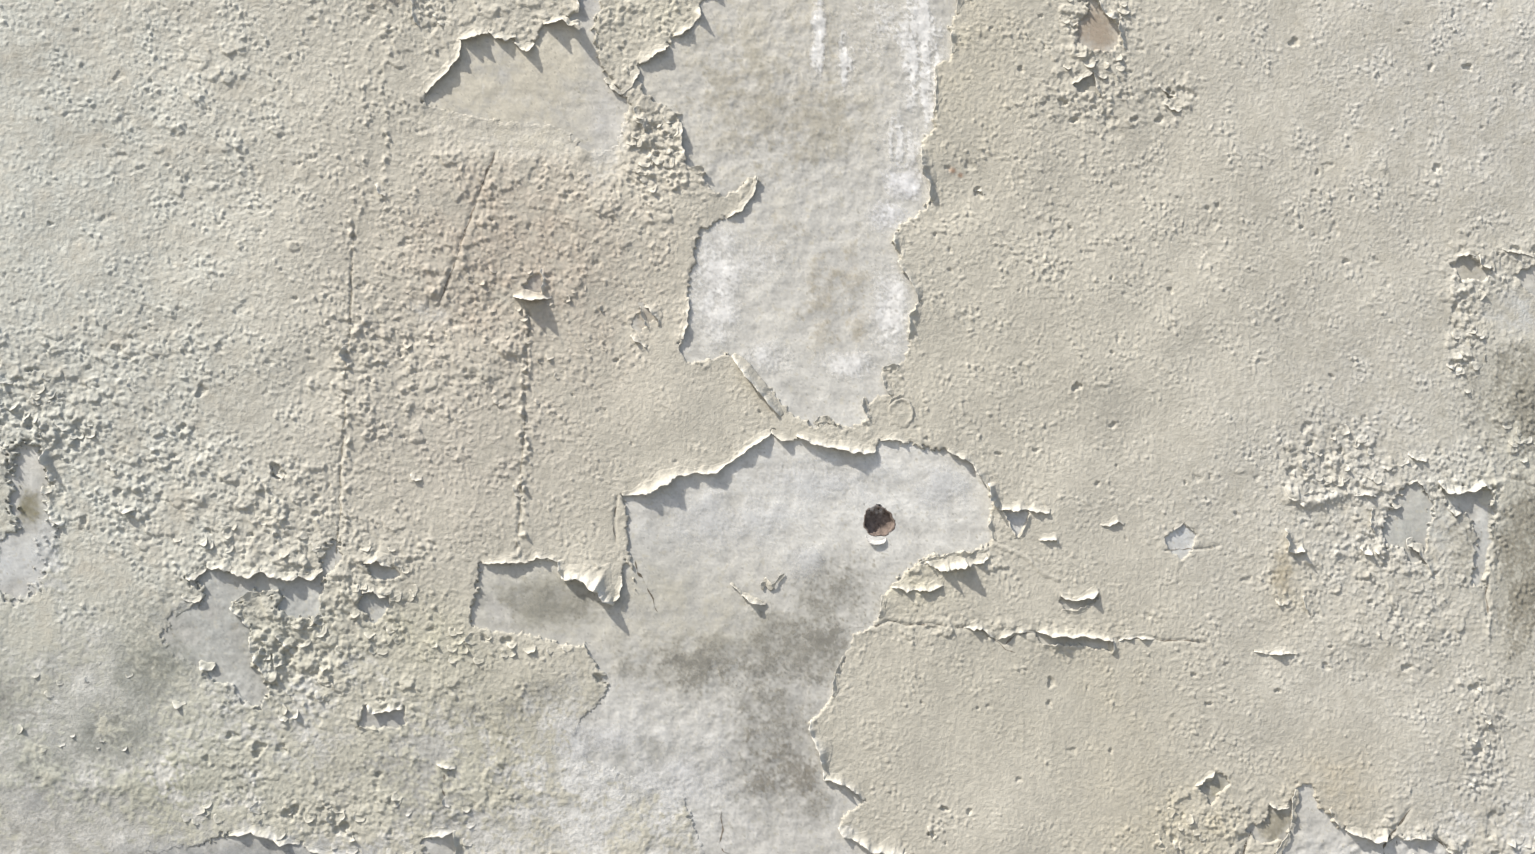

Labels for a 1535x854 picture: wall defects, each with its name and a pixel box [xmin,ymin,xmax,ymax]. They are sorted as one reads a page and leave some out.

peeling [1059,0,1130,99]
peeling [1451,247,1535,301]
peeling [1446,327,1489,393]
peeling [411,0,1059,854]
peeling [0,359,96,607]
peeling [160,517,343,722]
peeling [350,545,418,655]
peeling [1165,520,1196,560]
peeling [1284,424,1498,586]
damp [1497,490,1535,644]
peeling [356,700,406,734]
peeling [1246,782,1456,854]